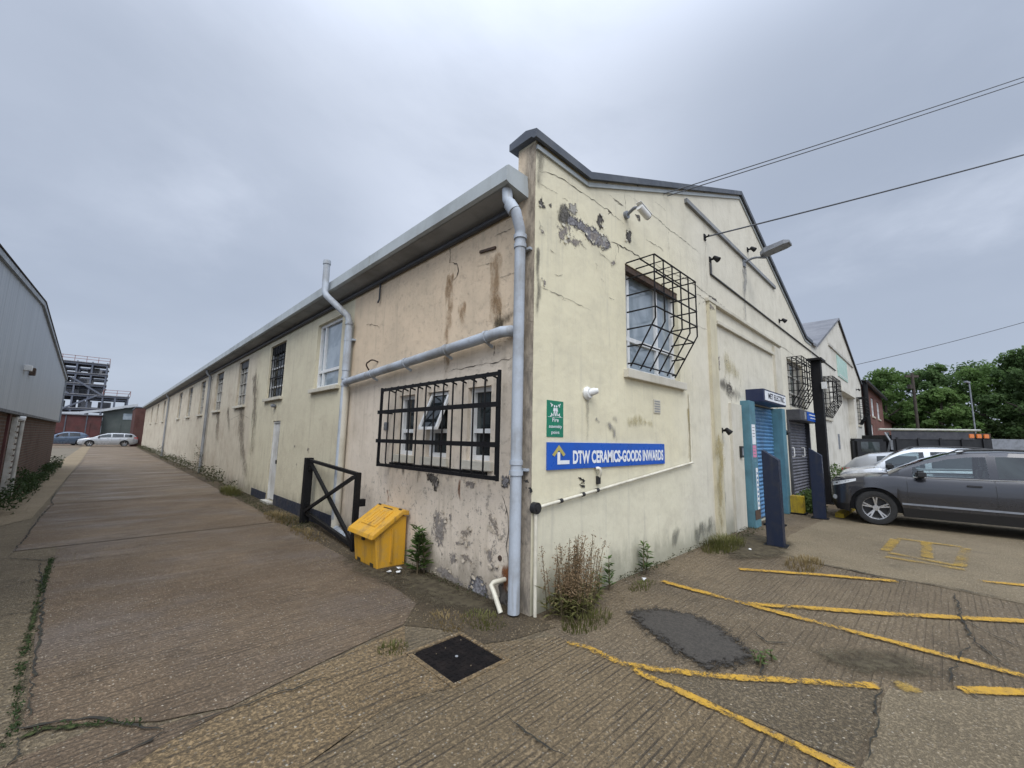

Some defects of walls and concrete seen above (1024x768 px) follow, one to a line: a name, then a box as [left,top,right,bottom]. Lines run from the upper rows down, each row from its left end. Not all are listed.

flaking render [557,203,611,250]
leakage [490,260,512,328]
leakage [216,375,258,471]
flaking render [430,510,502,599]
crack [949,621,1021,682]